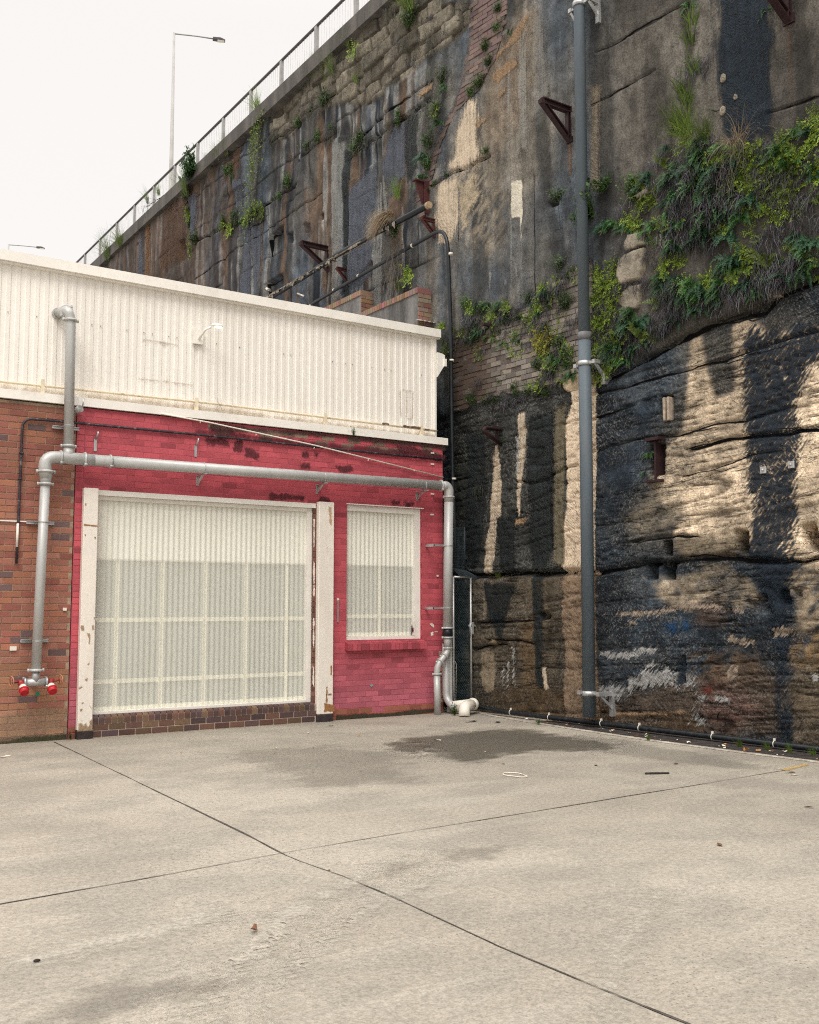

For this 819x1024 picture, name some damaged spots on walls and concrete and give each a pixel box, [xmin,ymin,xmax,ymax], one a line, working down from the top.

damp [712,0,775,143]
damp [232,179,263,296]
damp [390,729,608,761]